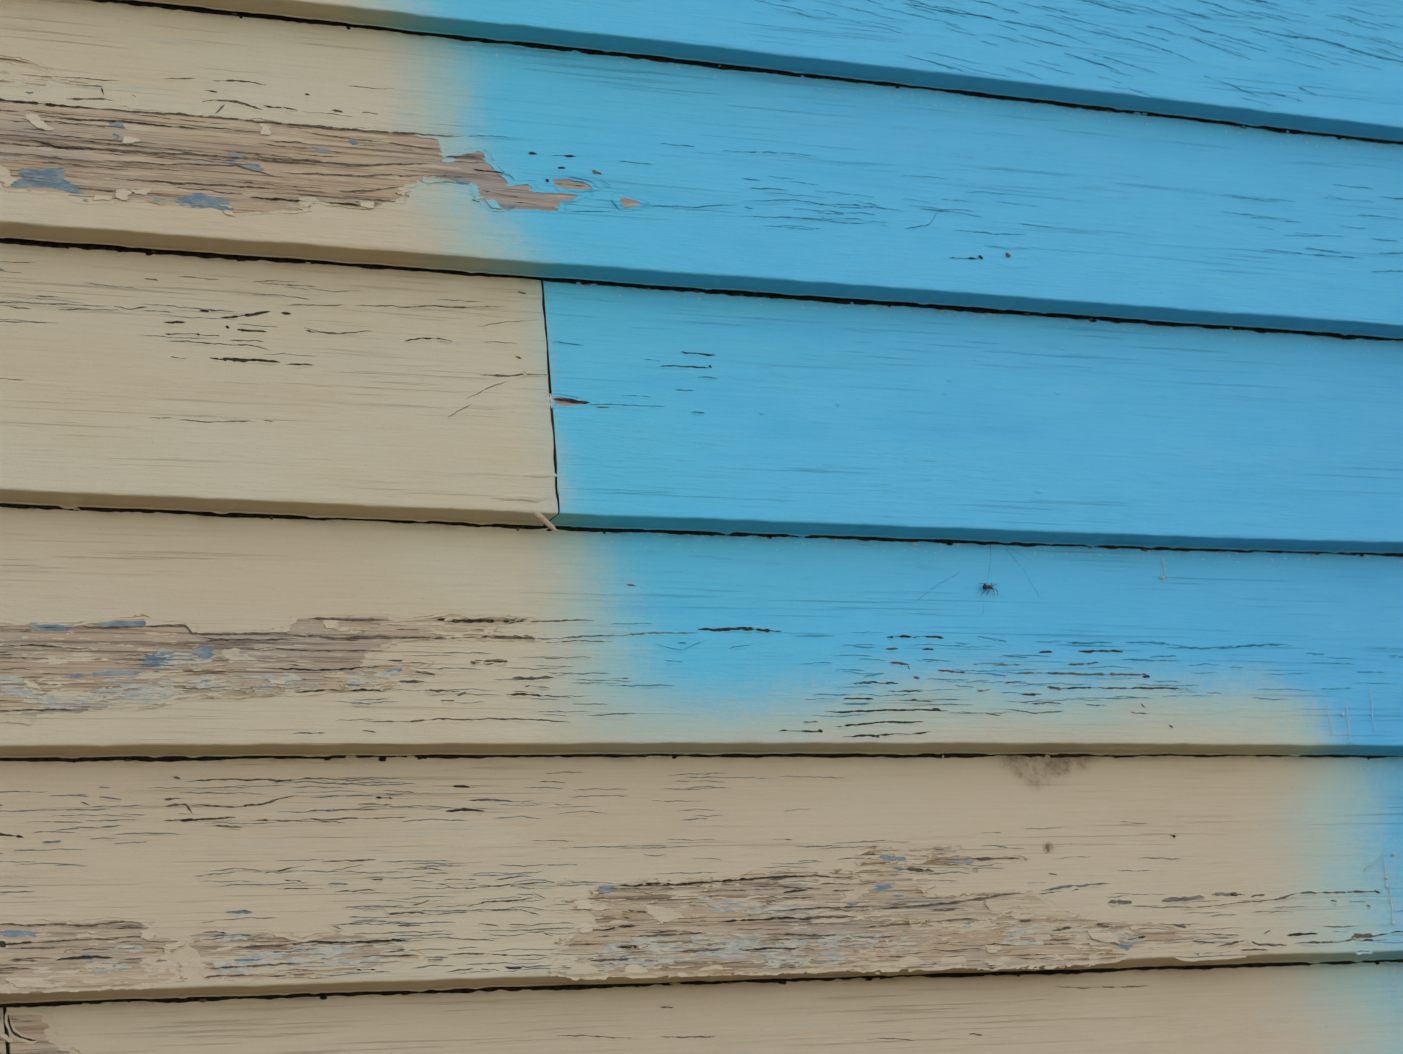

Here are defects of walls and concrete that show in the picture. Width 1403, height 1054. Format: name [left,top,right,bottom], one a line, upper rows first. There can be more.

peeling [0,55,648,217]
peeling [0,610,546,725]
peeling [0,842,1403,994]
peeling [0,1011,81,1054]